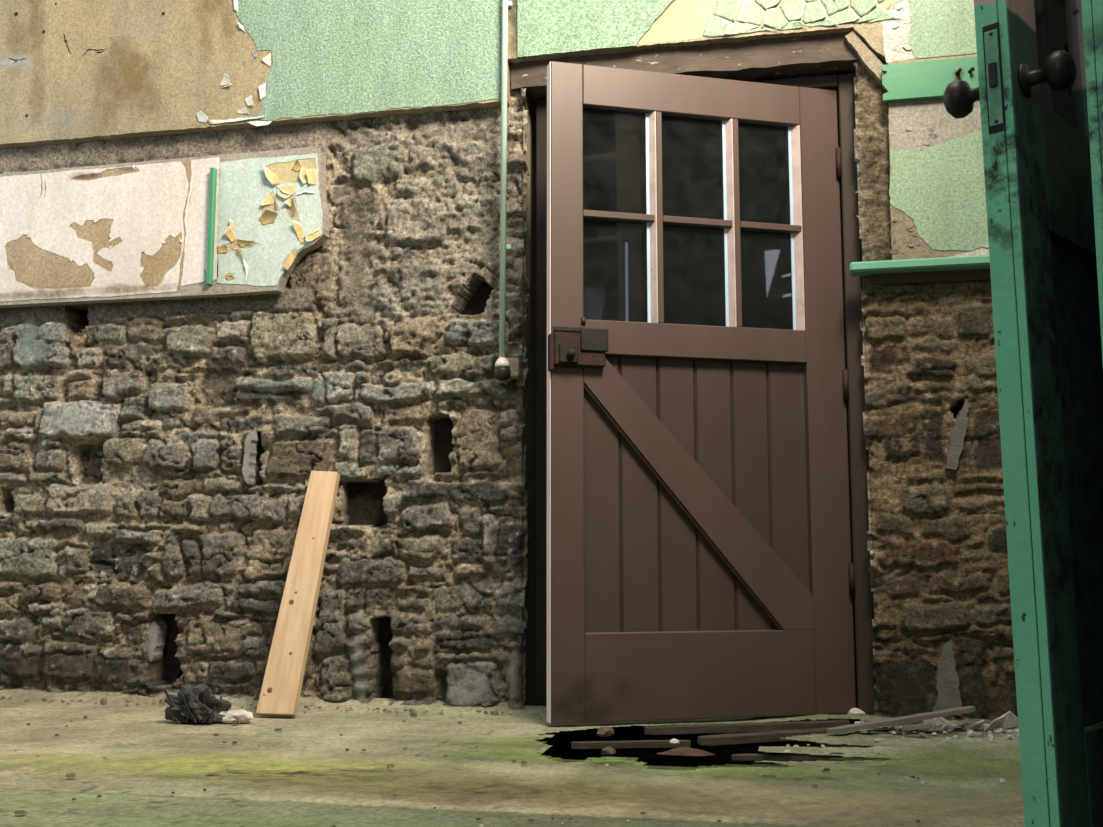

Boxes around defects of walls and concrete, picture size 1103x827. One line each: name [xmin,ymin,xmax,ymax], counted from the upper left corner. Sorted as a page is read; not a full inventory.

peeling [637,0,915,63]
spalling [888,98,982,151]
peeling [70,163,140,181]
peeling [4,219,122,289]
peeling [139,232,183,287]
spalling [177,272,245,296]
peeling [217,218,258,260]
peeling [259,158,322,271]
spalling [889,205,989,260]